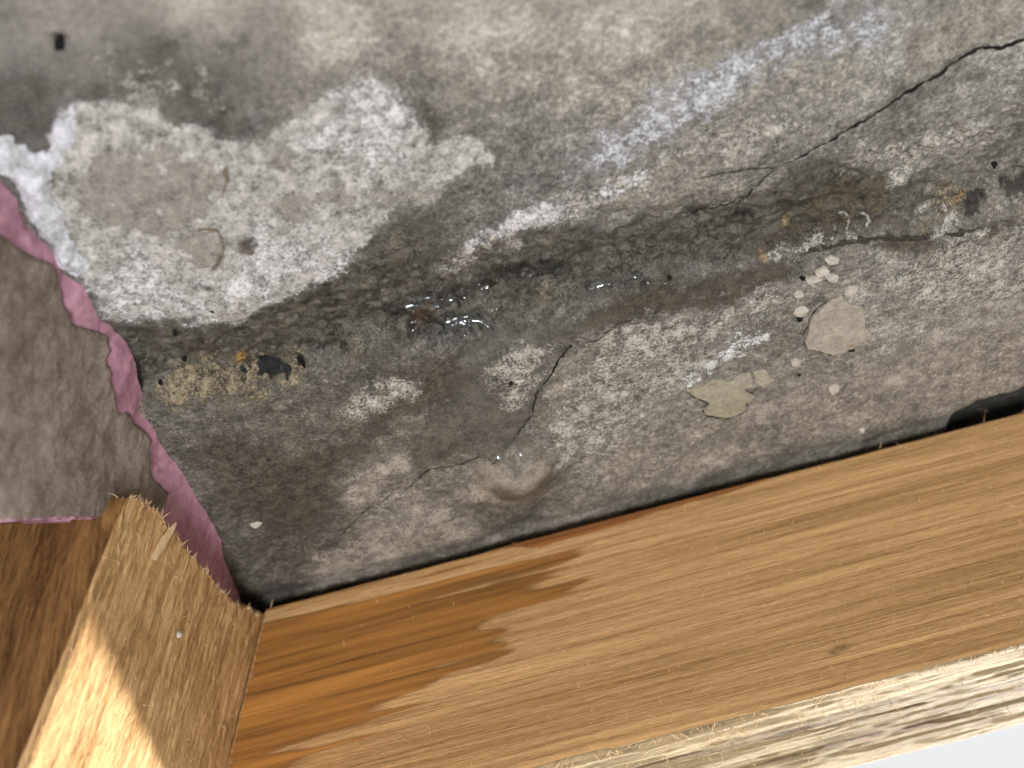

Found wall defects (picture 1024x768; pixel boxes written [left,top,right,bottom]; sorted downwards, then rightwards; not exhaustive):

crack [692,38,1024,215]
crack [329,320,632,541]
water stain [0,0,1024,536]
peeling [686,369,774,419]
peeling [793,255,872,356]
water stain [228,374,850,768]